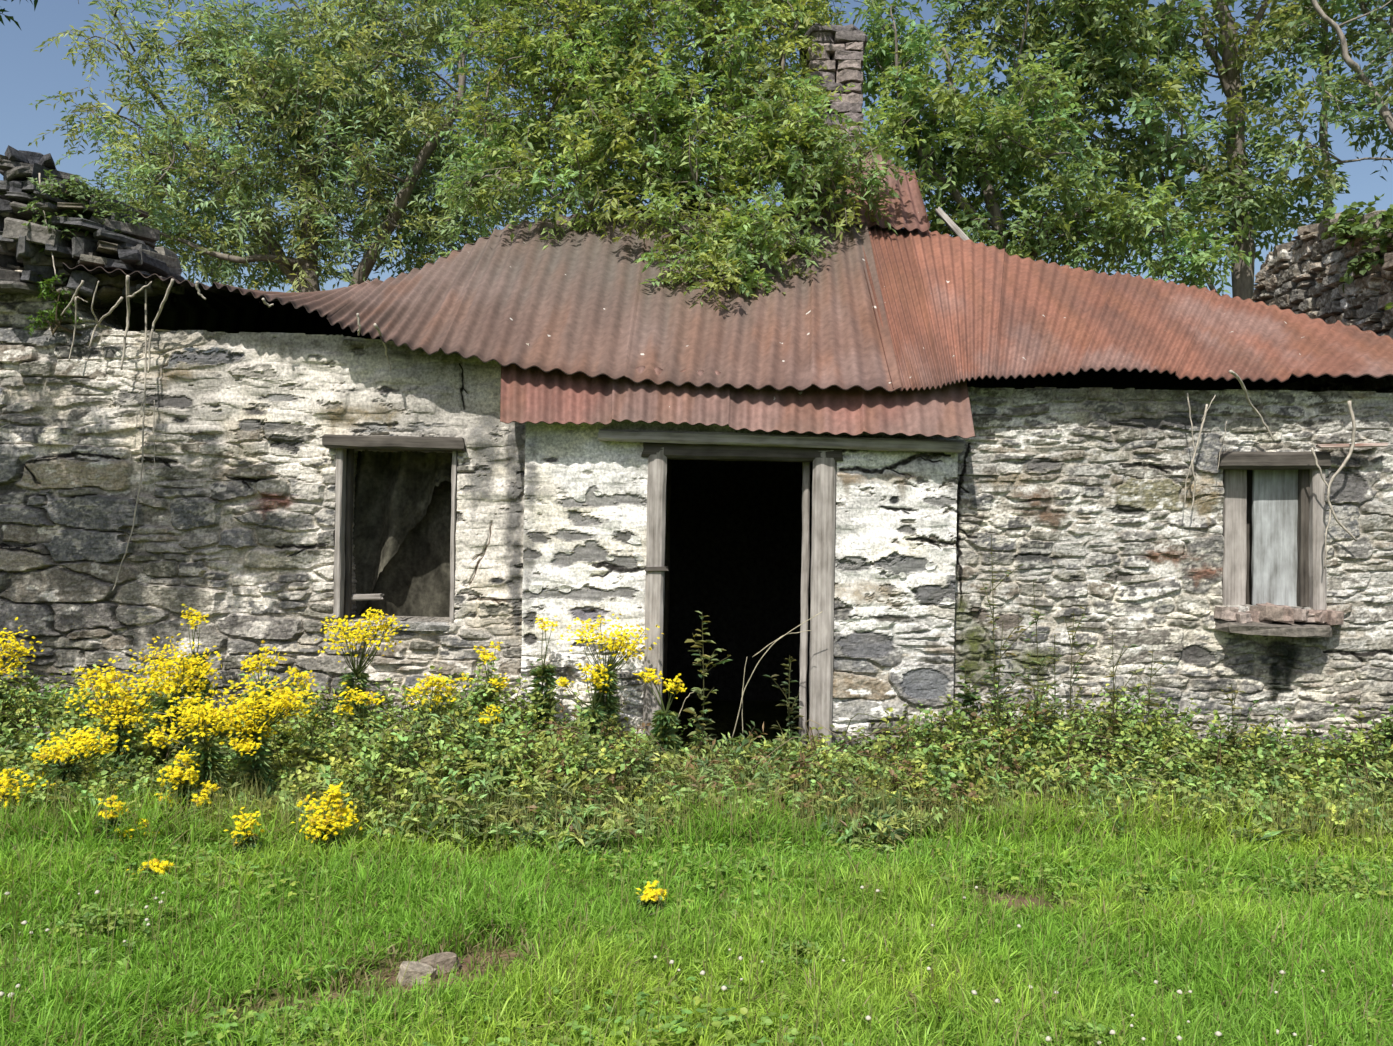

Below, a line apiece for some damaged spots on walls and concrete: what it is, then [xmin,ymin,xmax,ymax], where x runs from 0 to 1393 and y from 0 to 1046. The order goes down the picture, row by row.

peeling [523,486,647,568]
peeling [897,525,915,534]
peeling [924,496,957,507]
peeling [523,585,638,645]
peeling [836,555,1023,657]
peeling [901,668,949,699]
leakage [1268,641,1299,697]